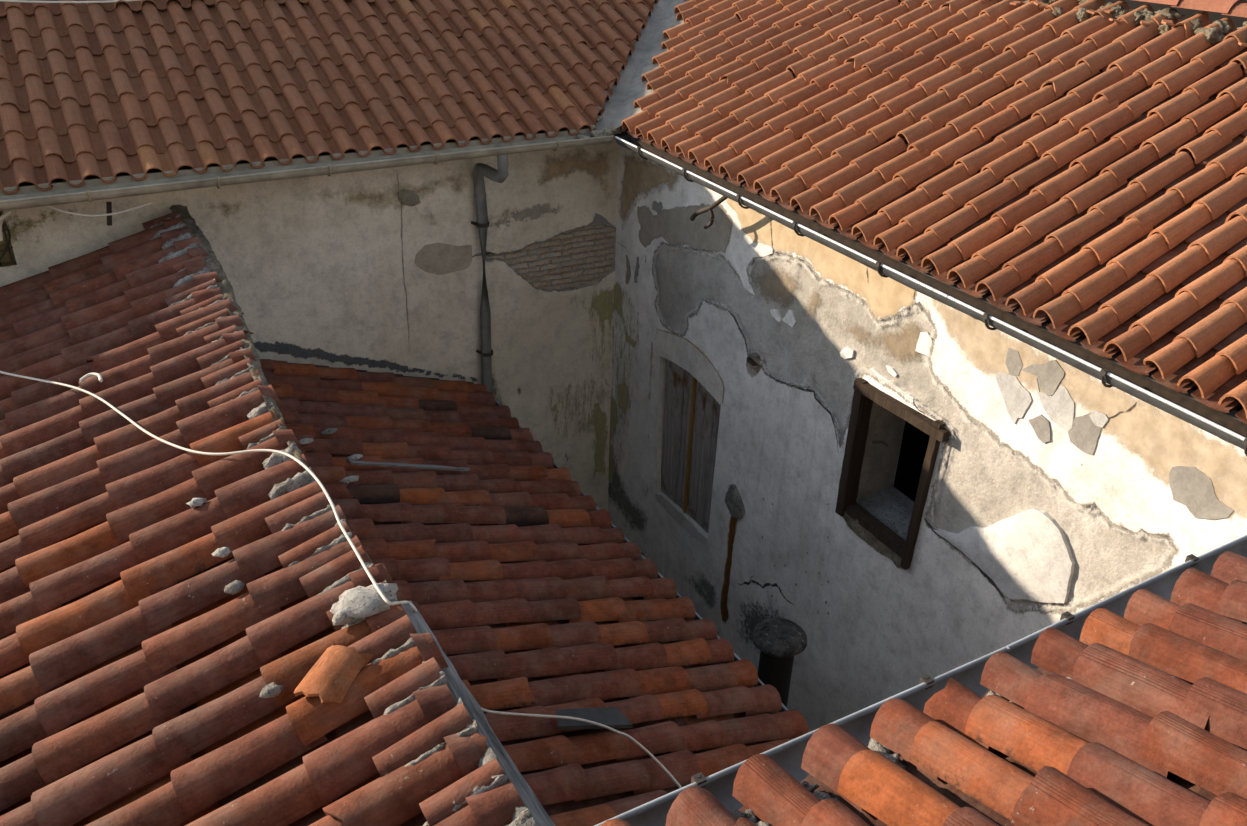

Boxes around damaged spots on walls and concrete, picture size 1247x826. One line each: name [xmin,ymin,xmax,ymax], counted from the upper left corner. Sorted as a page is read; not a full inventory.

flaking render [485,213,616,292]
leakage [551,291,653,529]
flaking render [652,242,1179,614]
corrosion [720,516,737,623]
crack [737,576,795,606]